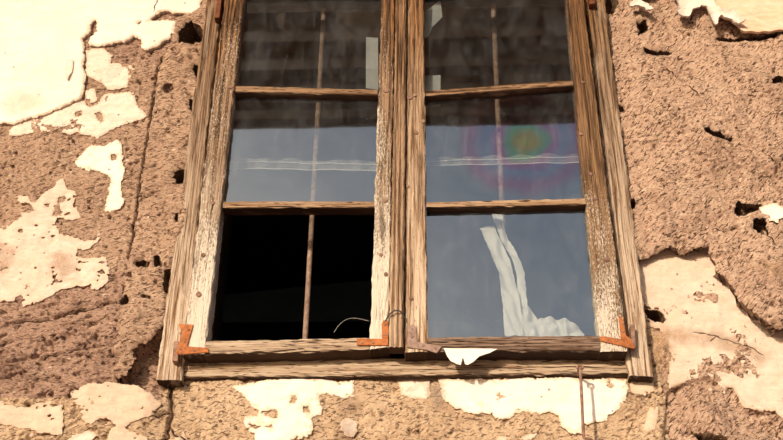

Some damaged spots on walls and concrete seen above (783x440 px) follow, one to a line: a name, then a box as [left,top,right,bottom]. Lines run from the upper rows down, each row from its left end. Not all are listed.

peeling [0,0,203,126]
spalling [0,62,161,307]
crack [131,67,160,246]
spalling [108,0,207,384]
spalling [606,0,783,420]
spalling [0,272,164,440]
spalling [125,318,670,440]